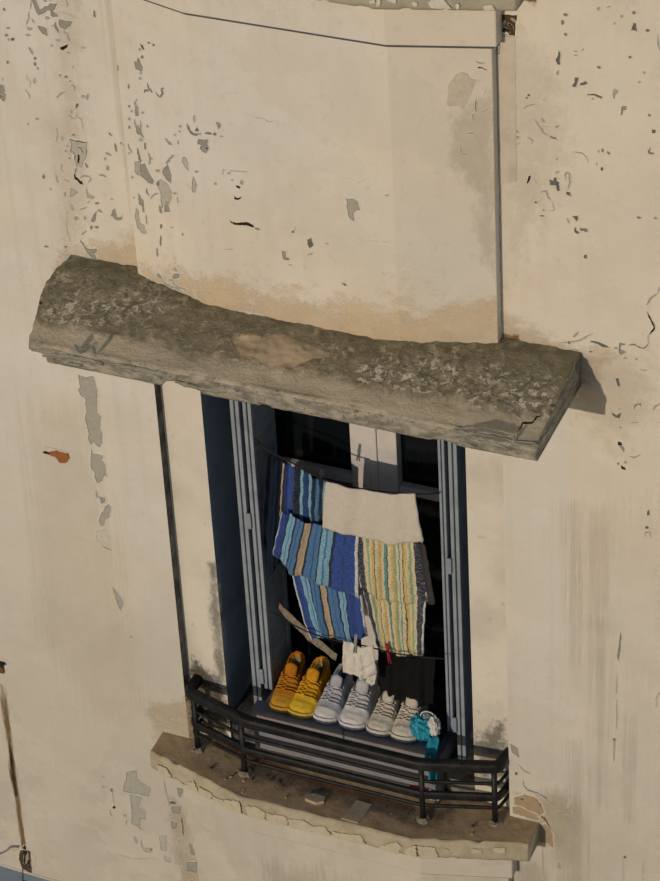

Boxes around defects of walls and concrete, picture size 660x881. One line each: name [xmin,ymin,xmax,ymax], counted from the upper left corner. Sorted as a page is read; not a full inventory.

peeling [4,0,87,70]
peeling [571,76,628,116]
peeling [42,41,224,260]
peeling [548,157,573,197]
peeling [345,197,362,222]
peeling [234,334,331,370]
crack [560,285,660,371]
crack [502,379,544,432]
corrosion [42,445,72,463]
peeling [42,343,226,551]
peeling [101,768,198,881]
flaking render [511,792,556,849]